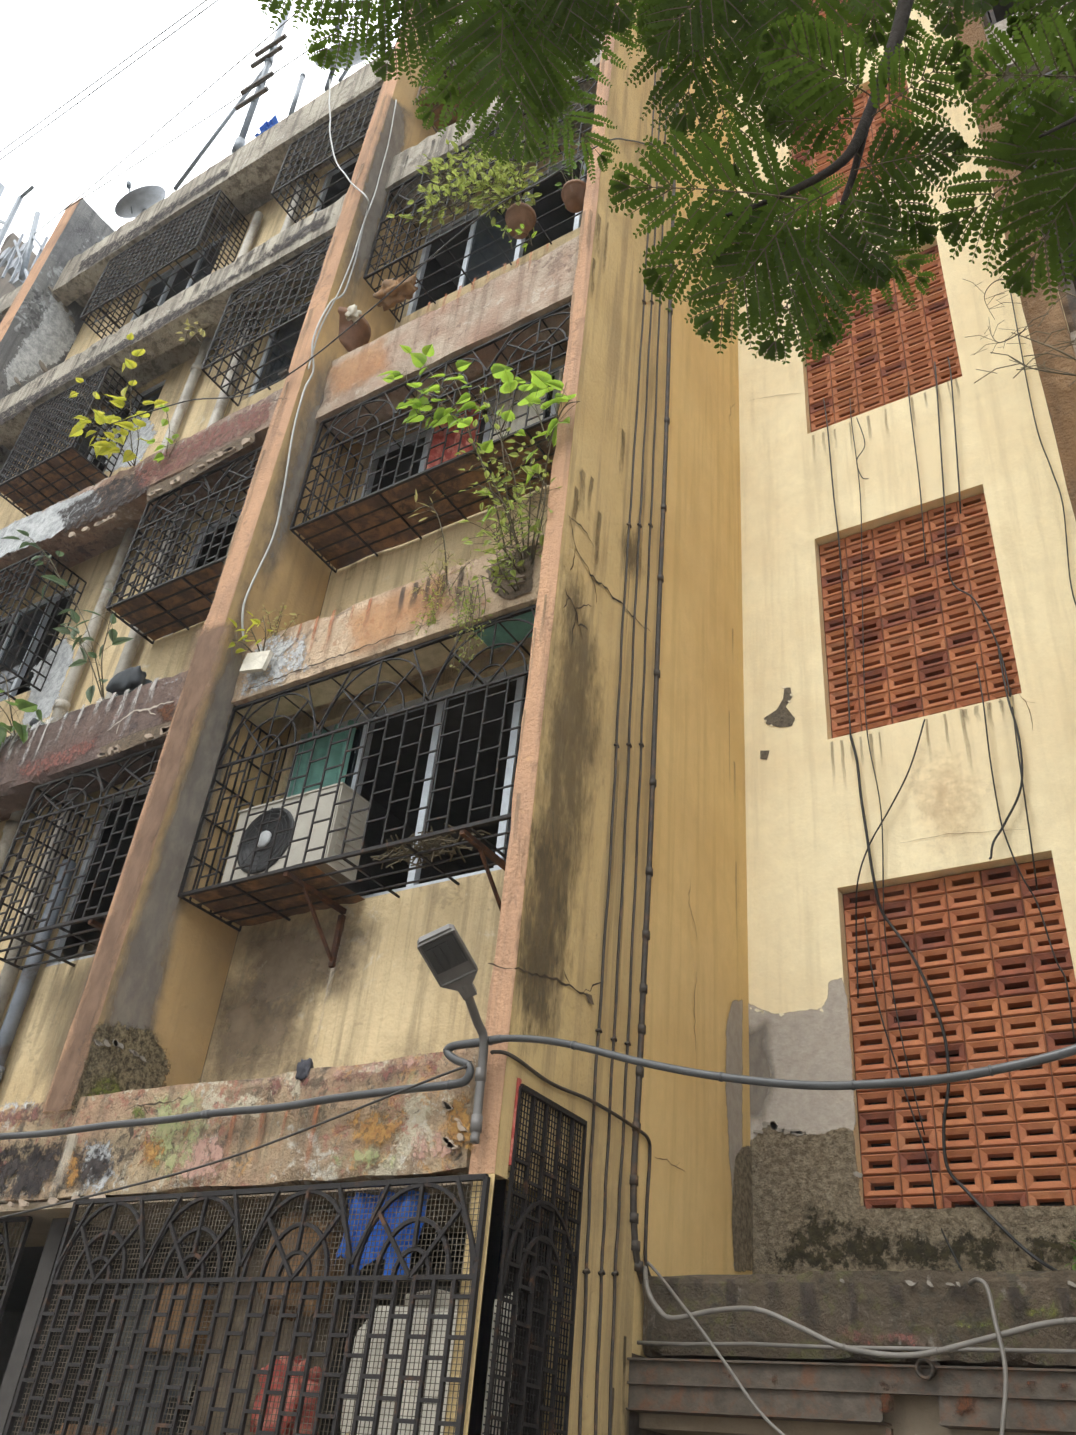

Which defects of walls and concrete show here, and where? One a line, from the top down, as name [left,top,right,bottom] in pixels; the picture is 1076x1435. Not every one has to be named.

peeling [3,286,77,392]
leakage [573,471,594,512]
crack [563,515,650,644]
leakage [0,616,309,1118]
leakage [519,588,598,1028]
crack [488,963,605,1003]
leakage [0,1133,124,1201]
peeling [732,1121,1076,1288]